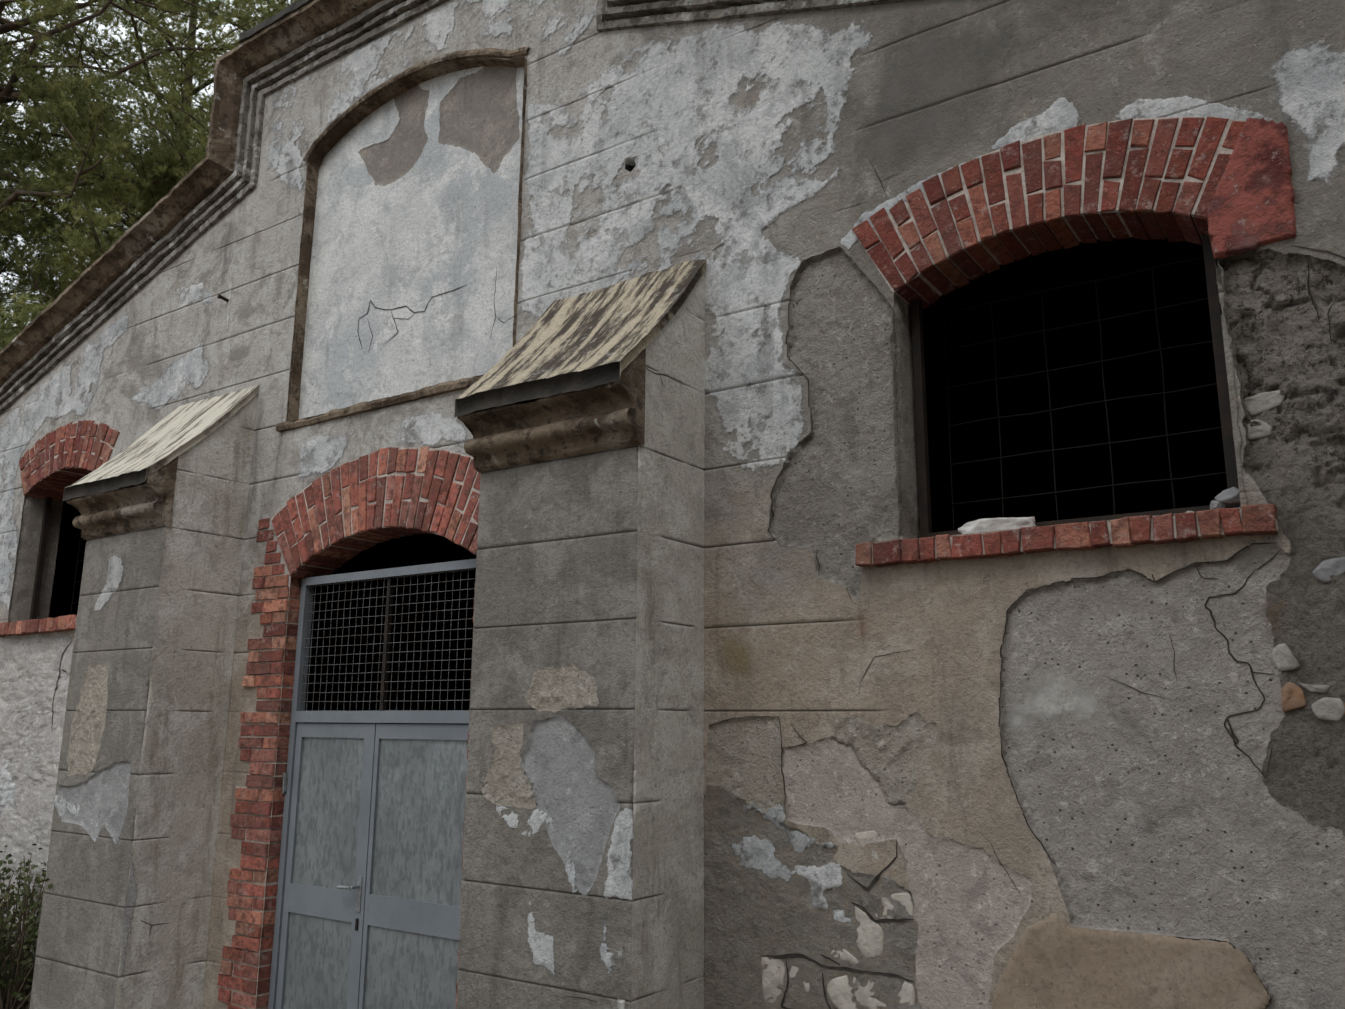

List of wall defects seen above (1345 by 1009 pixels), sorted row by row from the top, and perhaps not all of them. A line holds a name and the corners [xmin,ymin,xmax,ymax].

peeling [267,0,597,192]
peeling [1115,41,1345,186]
crack [357,270,514,352]
peeling [359,18,1079,600]
peeling [298,435,348,478]
spalling [0,633,131,982]
peeling [527,902,555,975]
peeling [482,665,634,901]
peeling [599,917,623,973]
spalling [703,712,1033,1009]
crack [998,543,1281,864]
spalling [1000,248,1345,1009]